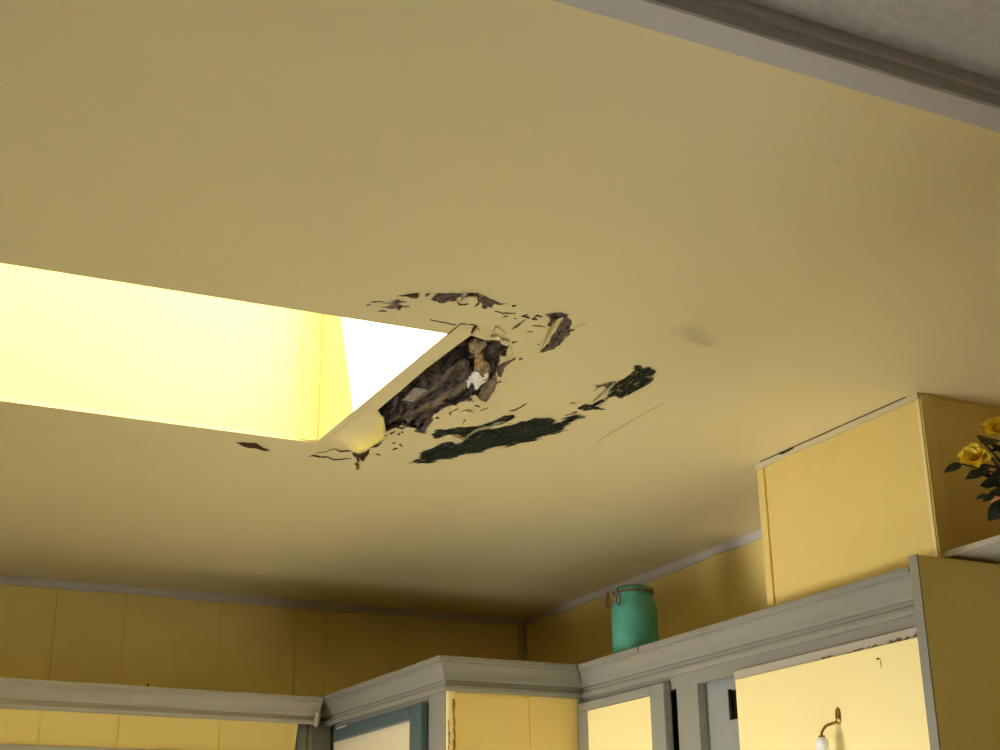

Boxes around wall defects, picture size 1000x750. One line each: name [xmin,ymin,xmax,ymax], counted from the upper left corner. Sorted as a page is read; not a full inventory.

peeling [399,292,506,309]
peeling [540,312,574,353]
crack [430,398,527,424]
water stain [409,365,656,464]
peeling [235,442,269,451]
peeling [322,410,390,470]
crack [309,427,405,461]